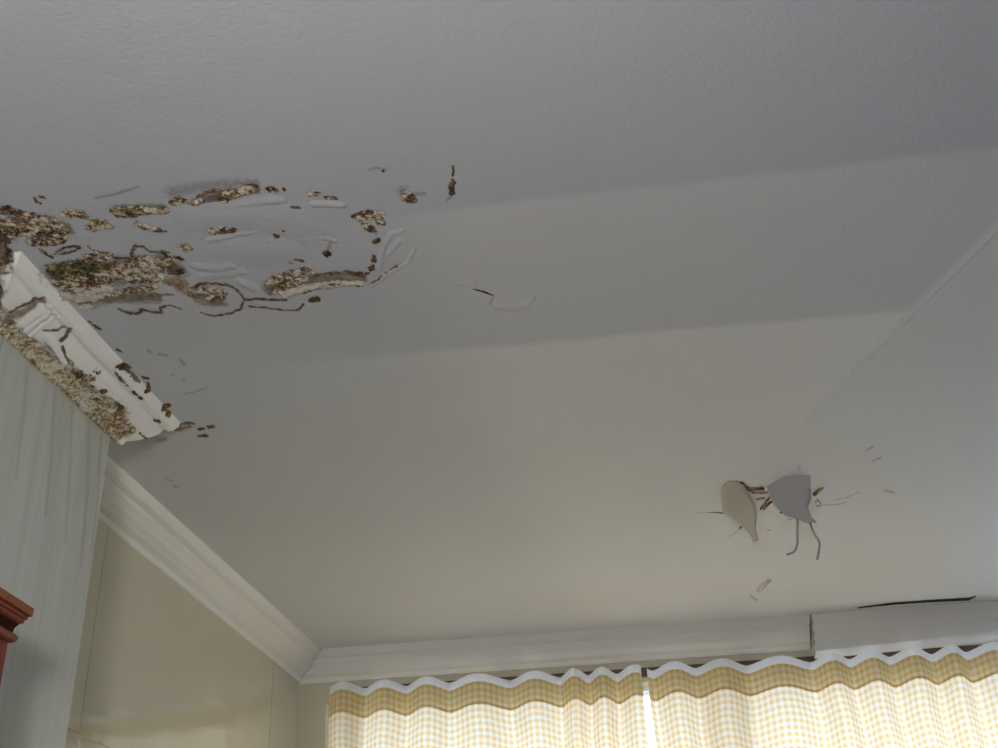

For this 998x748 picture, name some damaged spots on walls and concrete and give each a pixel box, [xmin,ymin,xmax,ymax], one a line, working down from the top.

peeling [307,192,338,200]
flaking render [400,190,417,203]
flaking render [448,165,456,196]
peeling [0,184,286,261]
flaking render [351,209,387,244]
leakage [0,237,14,306]
peeling [0,297,151,442]
flaking render [153,403,171,423]
peeling [721,462,824,543]